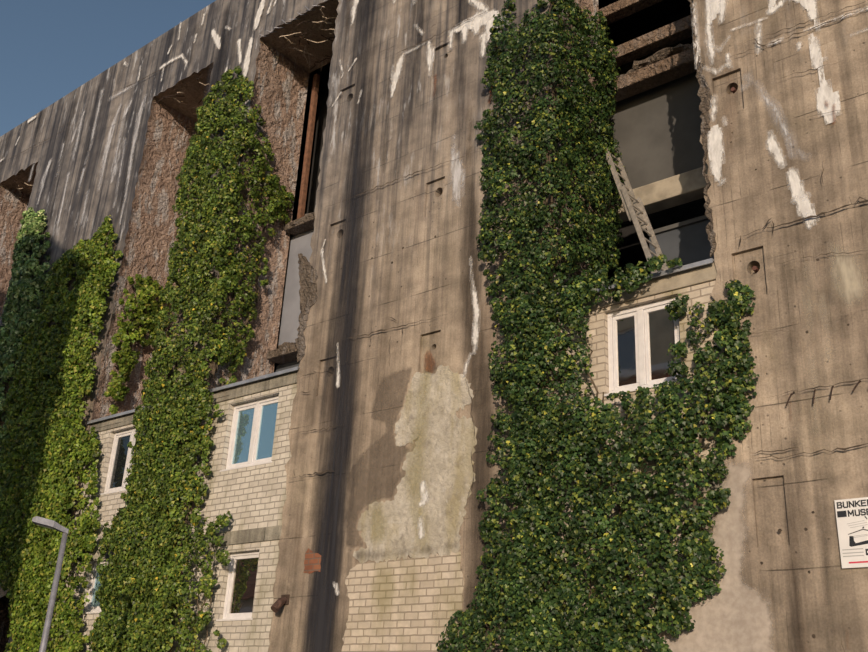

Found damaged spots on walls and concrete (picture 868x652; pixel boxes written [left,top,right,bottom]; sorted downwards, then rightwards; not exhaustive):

leakage [391,0,434,96]
spalling [688,0,717,257]
crack [739,197,868,245]
leakage [303,0,410,652]
crack [768,378,868,398]
crack [749,443,868,460]
flaking render [341,365,478,652]